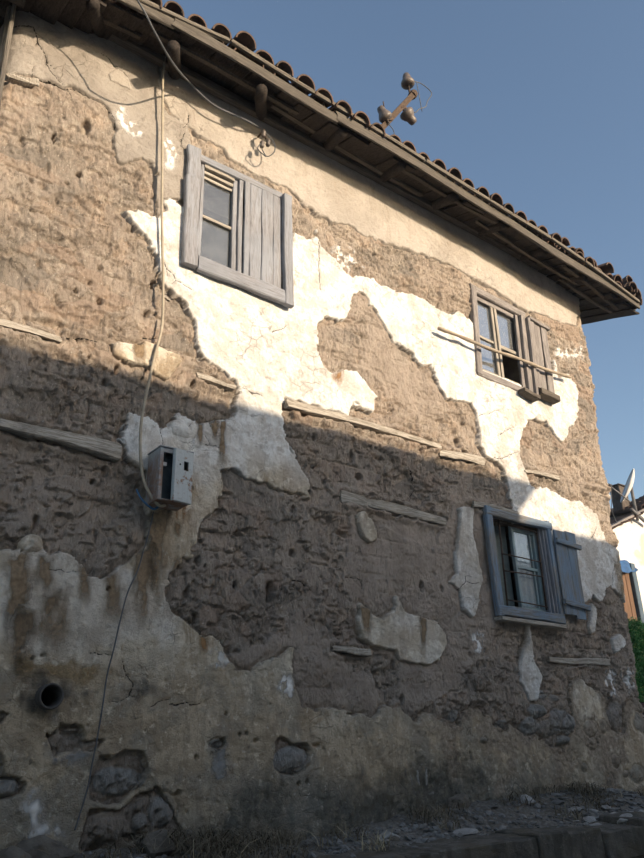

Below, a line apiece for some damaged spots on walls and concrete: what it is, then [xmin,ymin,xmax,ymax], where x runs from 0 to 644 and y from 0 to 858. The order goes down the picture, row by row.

crack [13,25,116,130]
spalling [187,127,513,319]
spalling [0,68,237,579]
damp [5,552,99,683]
damp [105,574,120,611]
damp [133,509,181,616]
spalling [164,293,639,748]